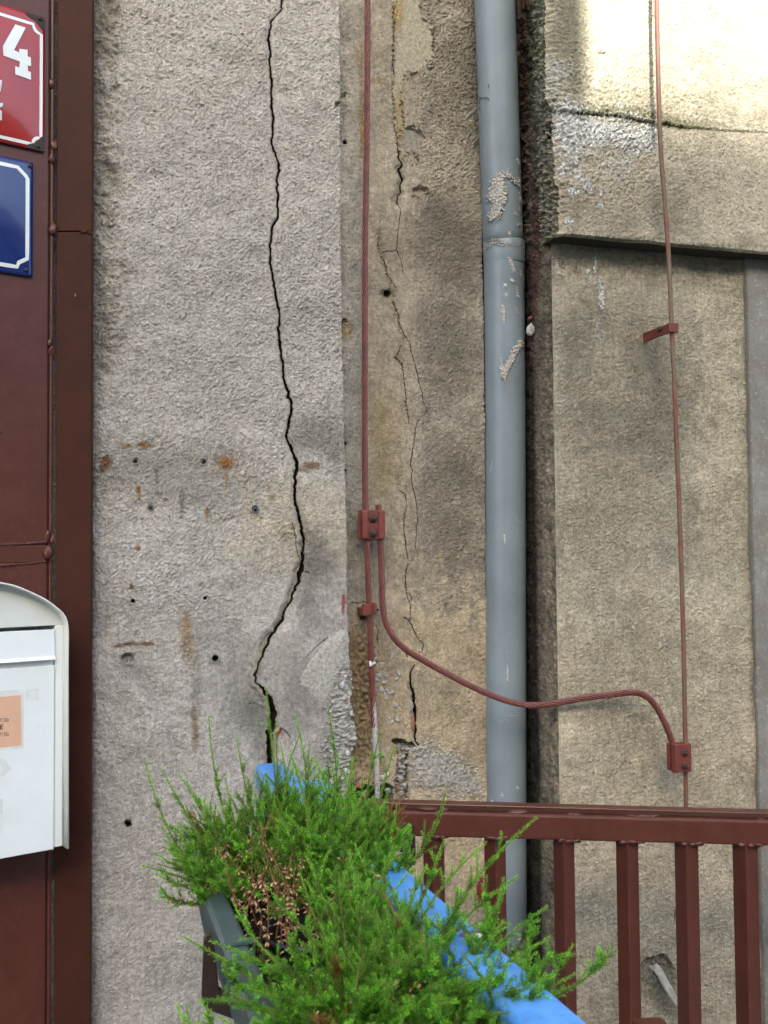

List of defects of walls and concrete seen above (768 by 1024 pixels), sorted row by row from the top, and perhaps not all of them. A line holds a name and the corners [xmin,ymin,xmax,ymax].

crack [377,6,406,271]
efflorescence [545,56,665,207]
crack [250,0,310,764]
rust [100,454,110,473]
rust [219,456,232,479]
crack [402,341,432,746]
spalling [391,738,414,799]